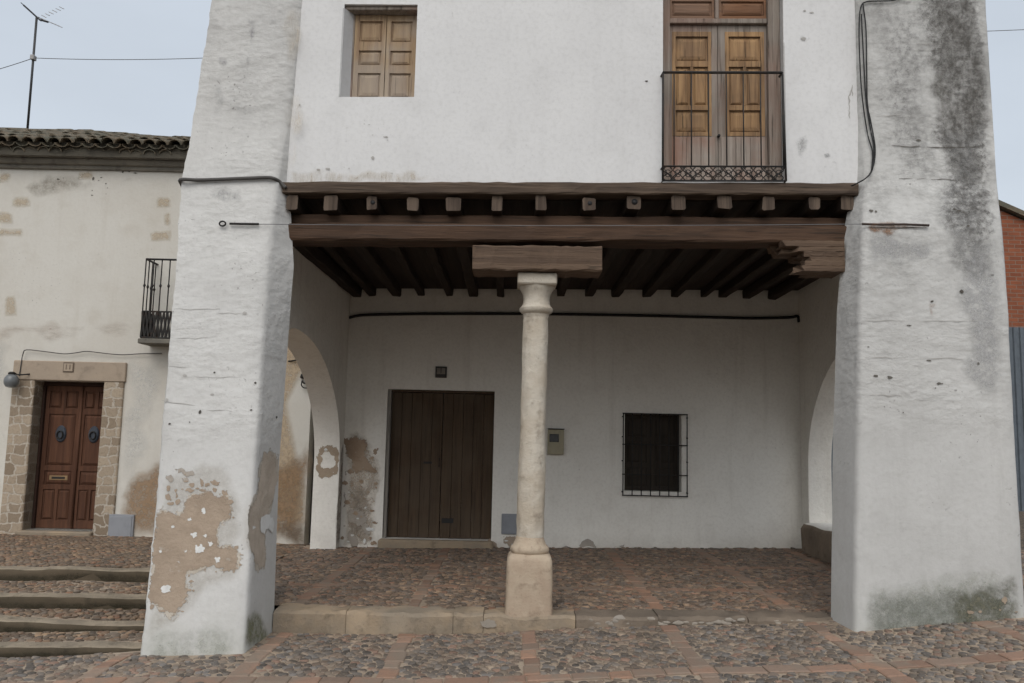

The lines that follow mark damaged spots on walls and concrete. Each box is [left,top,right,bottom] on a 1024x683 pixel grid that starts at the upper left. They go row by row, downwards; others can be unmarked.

water stain [927,0,996,385]
water stain [127,468,159,529]
peeling [148,448,279,622]
peeling [316,436,379,547]